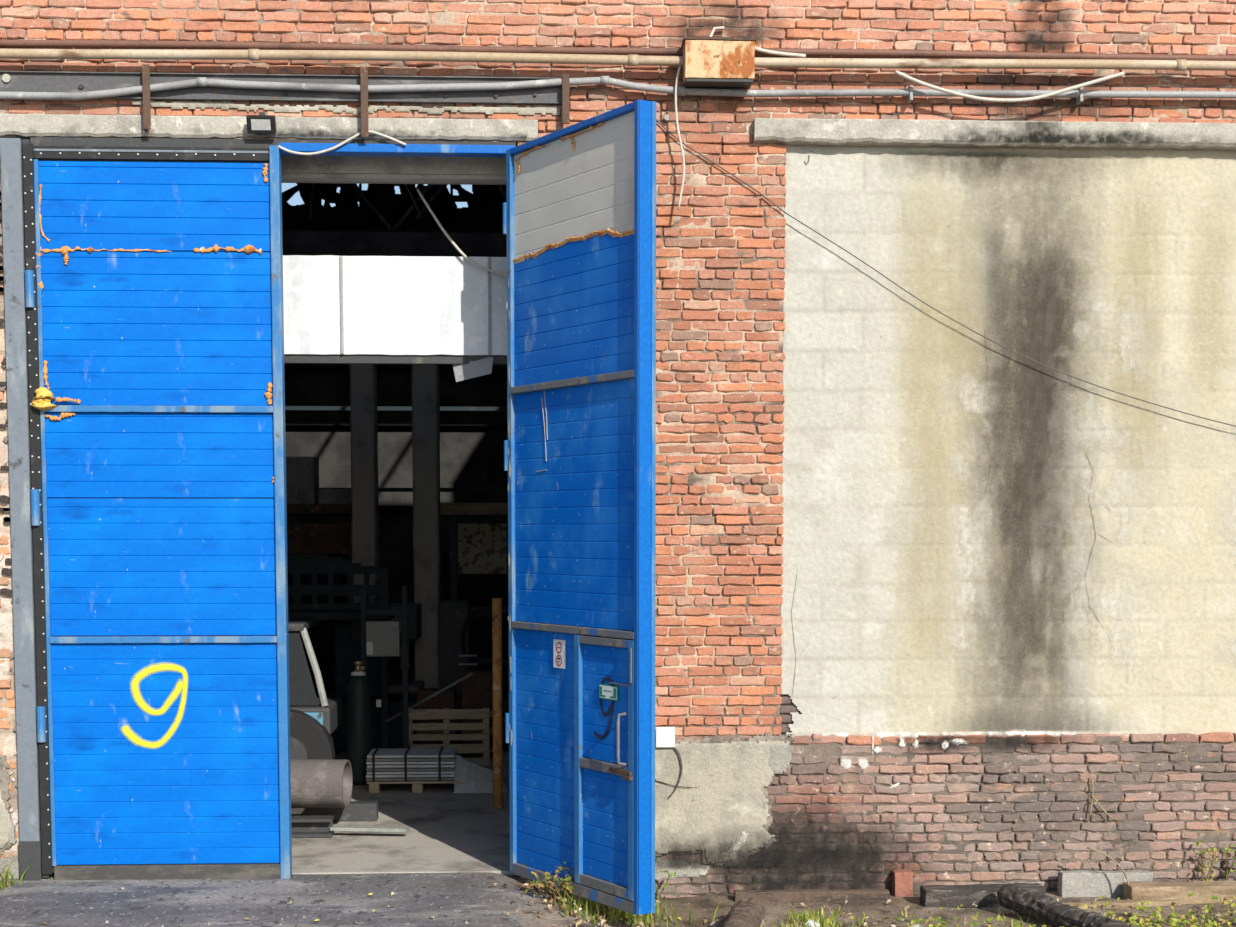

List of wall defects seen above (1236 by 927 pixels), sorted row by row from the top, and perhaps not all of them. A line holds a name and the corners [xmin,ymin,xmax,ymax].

spalling [0,356,8,443]
spalling [0,495,11,523]
leakage [987,238,1076,691]
spalling [0,553,13,603]
flaking render [0,752,19,880]
flaking render [655,696,798,881]